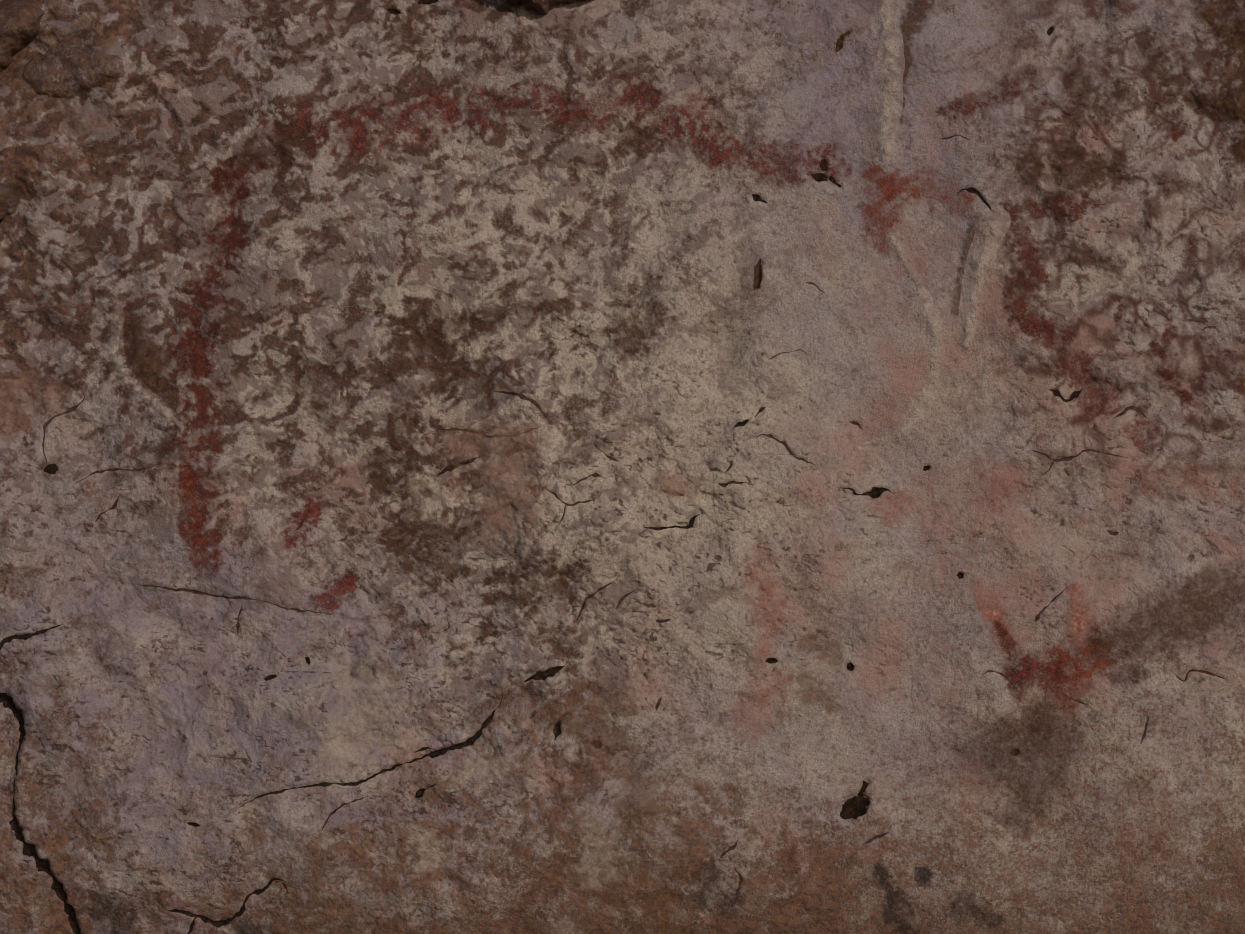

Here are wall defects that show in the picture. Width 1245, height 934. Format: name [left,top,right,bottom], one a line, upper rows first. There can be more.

crack [73,463,160,522]
crack [294,498,311,532]
crack [0,624,63,650]
crack [137,584,342,634]
crack [227,665,567,830]
crack [0,693,81,934]
crack [167,878,288,934]